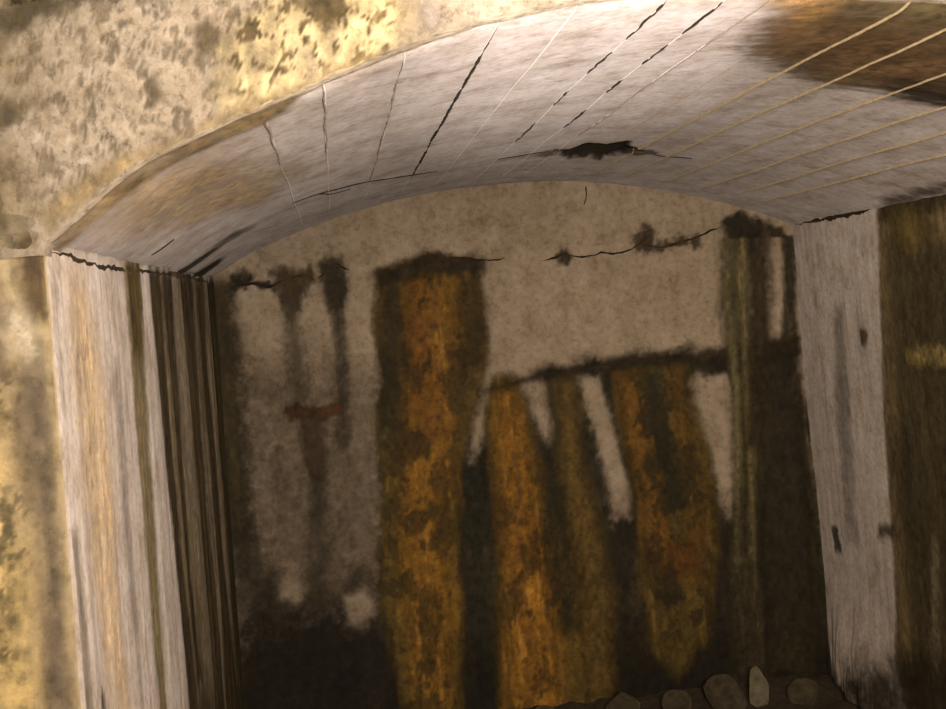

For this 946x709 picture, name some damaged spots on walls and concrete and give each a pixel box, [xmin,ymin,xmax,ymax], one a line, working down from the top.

crack [293,26,498,203]
crack [543,245,637,261]
spalling [497,141,692,160]
crack [553,0,770,142]
crack [664,227,720,248]
leakage [751,0,946,106]
leakage [0,317,70,709]
leakage [125,258,402,709]
leakage [456,413,502,709]
rust [373,253,612,709]
rust [613,364,719,677]
leakage [492,184,946,709]